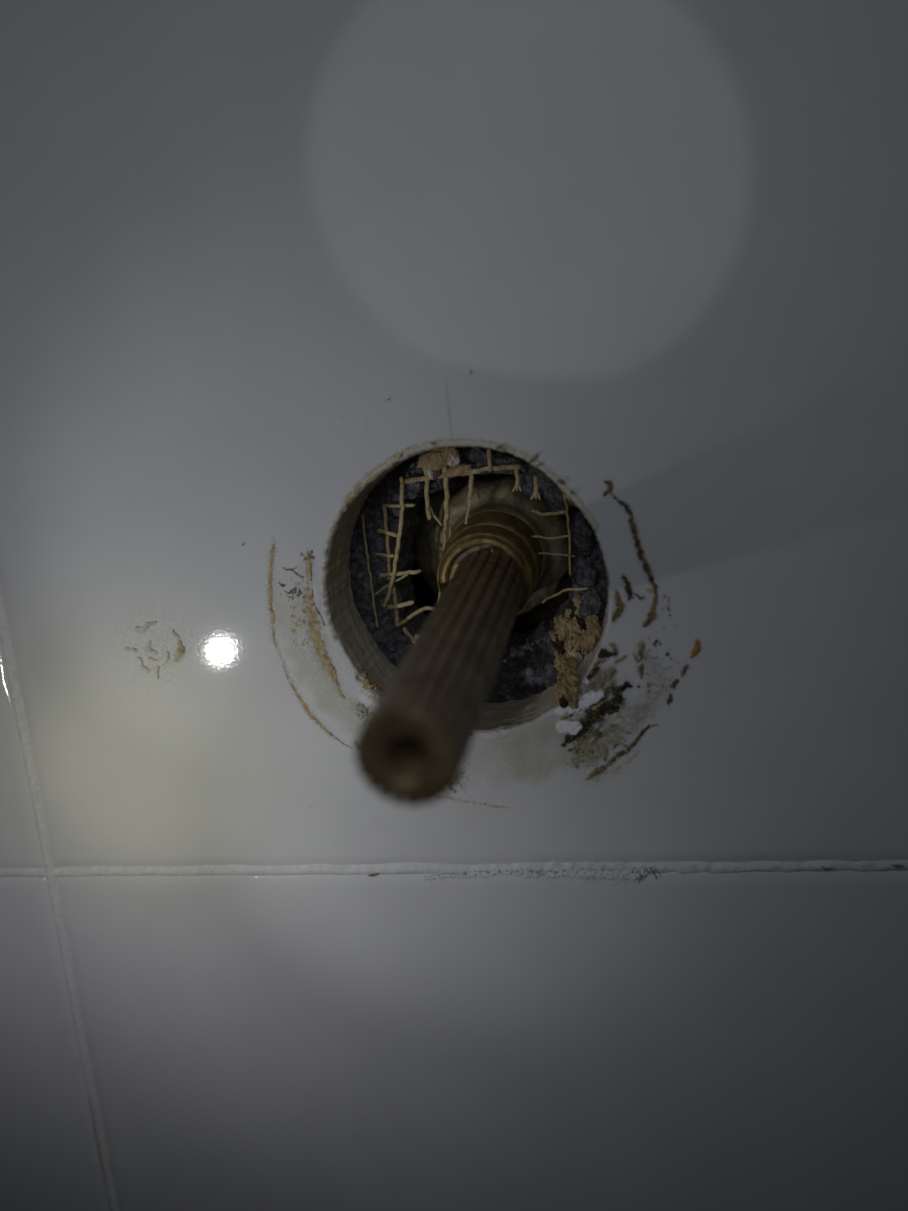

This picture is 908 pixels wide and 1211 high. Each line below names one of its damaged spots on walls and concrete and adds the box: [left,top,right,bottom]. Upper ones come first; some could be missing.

spalling [322,439,598,641]